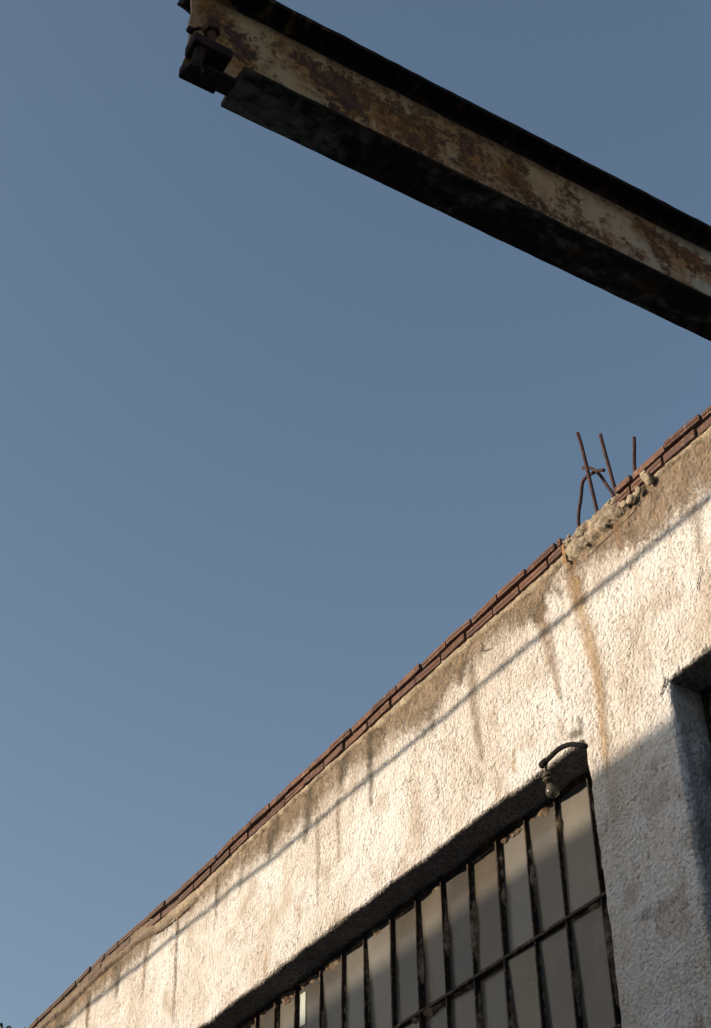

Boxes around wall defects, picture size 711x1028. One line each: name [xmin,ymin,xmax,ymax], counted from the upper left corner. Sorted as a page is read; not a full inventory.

rust [198,0,260,70]
rust [280,45,566,222]
rust [579,216,711,284]
spalling [561,470,653,564]
water stain [45,436,711,1028]